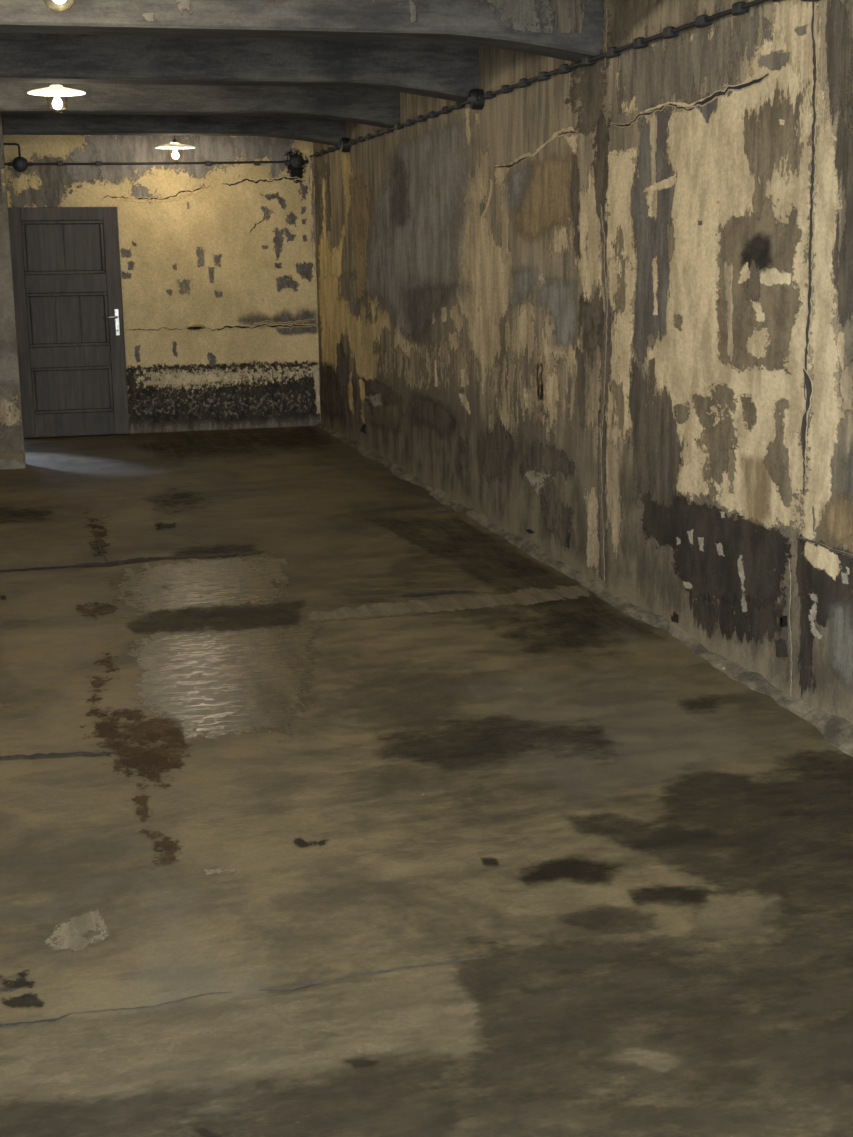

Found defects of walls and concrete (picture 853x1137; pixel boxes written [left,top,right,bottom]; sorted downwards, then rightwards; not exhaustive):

crack [610,72,769,128]
crack [494,126,580,169]
crack [101,176,307,235]
leakage [298,159,332,281]
leakage [348,119,468,340]
peeling [120,241,137,279]
peeling [166,263,191,296]
peeling [196,247,223,298]
peeling [260,0,853,578]
leakage [126,341,469,470]
crack [0,542,265,572]
leakage [0,751,853,1137]